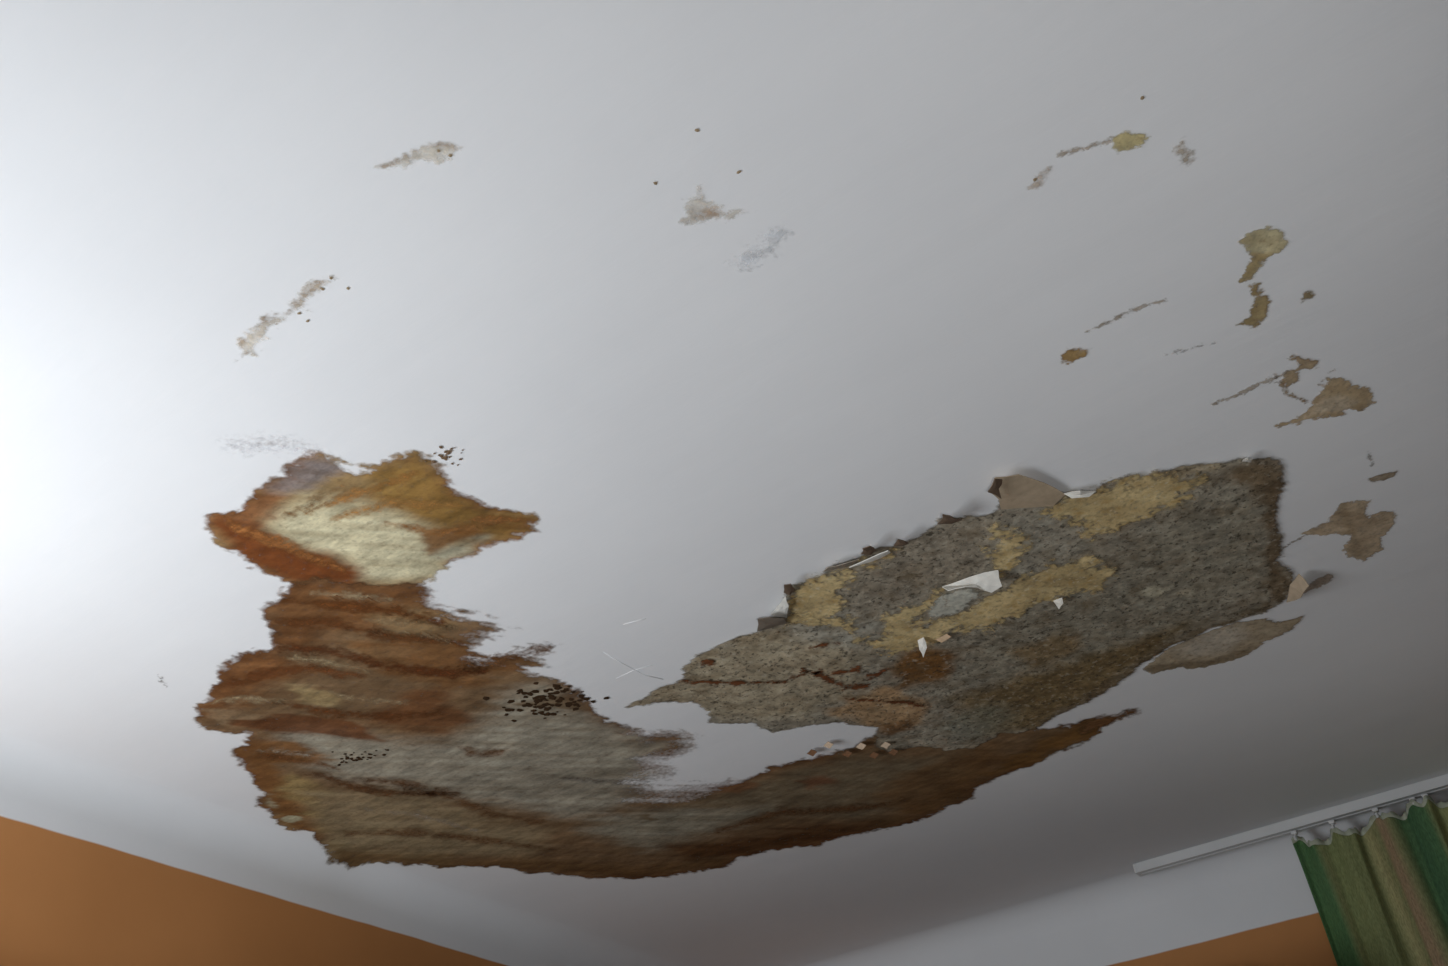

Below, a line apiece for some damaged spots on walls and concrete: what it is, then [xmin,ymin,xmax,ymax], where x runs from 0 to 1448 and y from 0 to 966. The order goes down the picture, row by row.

peeling [381,144,454,168]
peeling [1113,132,1147,151]
peeling [1237,226,1288,328]
peeling [292,281,321,308]
peeling [238,317,280,356]
peeling [1061,348,1087,365]
peeling [1282,355,1318,387]
peeling [1275,378,1376,428]
peeling [1369,471,1397,482]
peeling [1303,500,1395,561]
peeling [625,457,1333,759]